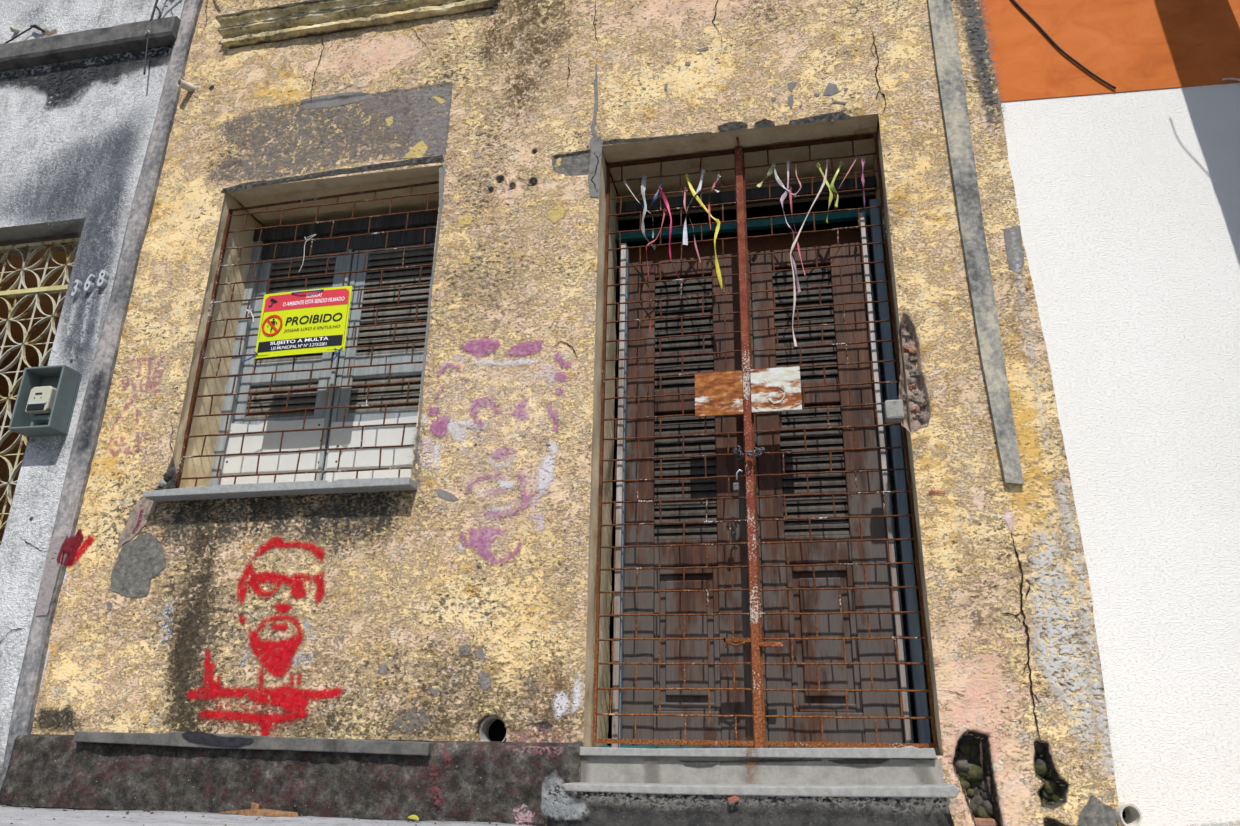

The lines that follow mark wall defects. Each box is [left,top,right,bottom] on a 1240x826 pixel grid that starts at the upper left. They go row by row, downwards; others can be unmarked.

damp [0,44,174,109]
damp [485,0,573,137]
peeling [209,82,453,484]
spalling [884,312,931,433]
damp [153,490,409,732]
damp [329,701,519,740]
damp [440,648,485,691]
spalling [953,730,1003,826]
crack [1000,533,1041,741]
spalling [1034,741,1069,826]